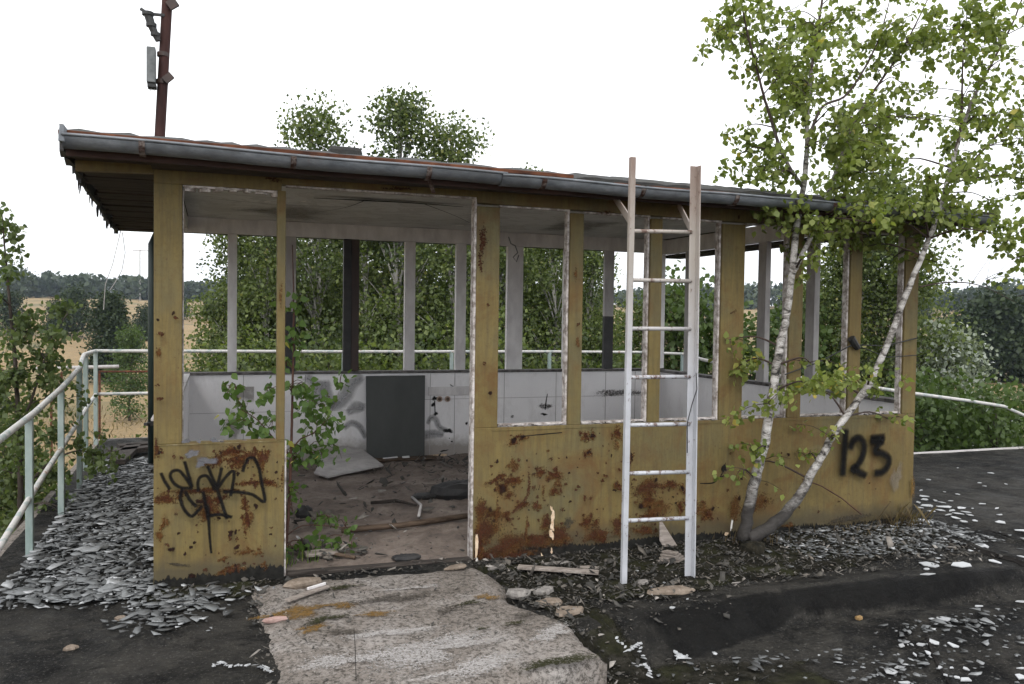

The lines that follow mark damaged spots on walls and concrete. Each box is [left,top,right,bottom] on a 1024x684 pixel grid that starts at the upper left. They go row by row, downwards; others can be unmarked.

rust [478,225,489,272]
rust [154,444,284,576]
peeling [541,506,555,556]
rust [341,425,776,560]